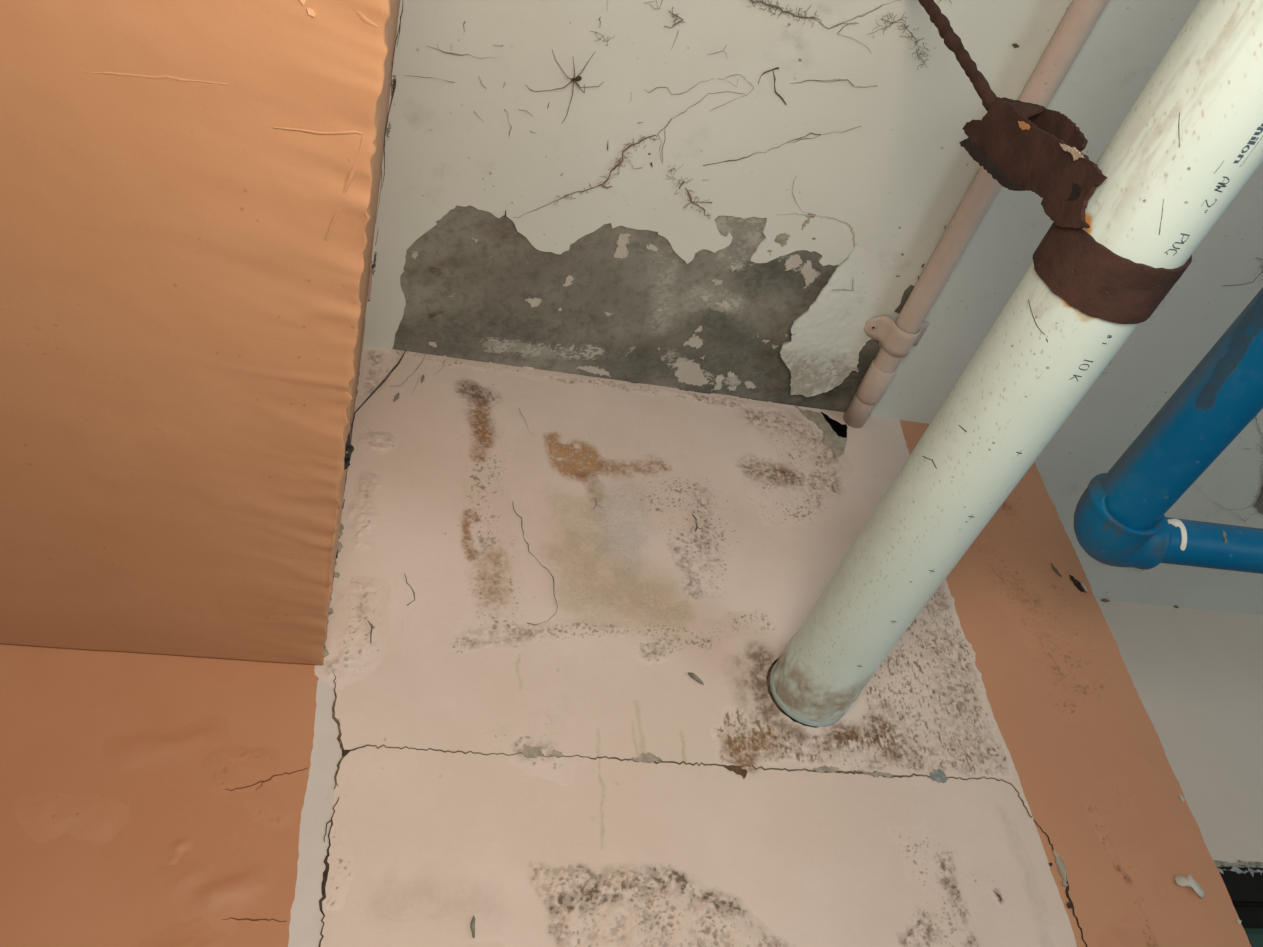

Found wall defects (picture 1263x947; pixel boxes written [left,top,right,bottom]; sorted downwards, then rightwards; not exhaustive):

corrosion [461,385,491,447]
corrosion [547,434,667,477]
spalling [357,205,914,666]
corrosion [463,511,474,559]
crack [222,505,1087,947]
water stain [752,652,802,738]